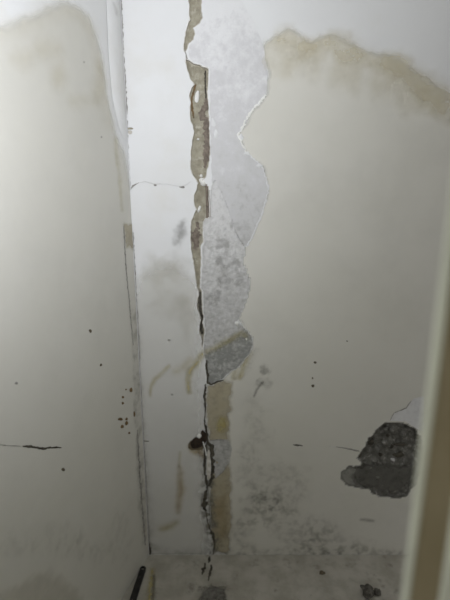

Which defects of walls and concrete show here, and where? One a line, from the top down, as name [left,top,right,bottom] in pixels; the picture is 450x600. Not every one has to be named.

crack [0,443,62,451]
crack [123,224,152,555]
crack [121,0,211,349]
crack [201,384,216,581]
flaking render [188,430,232,479]
peeling [188,0,269,385]
leakage [206,30,450,555]
spalling [341,396,424,498]